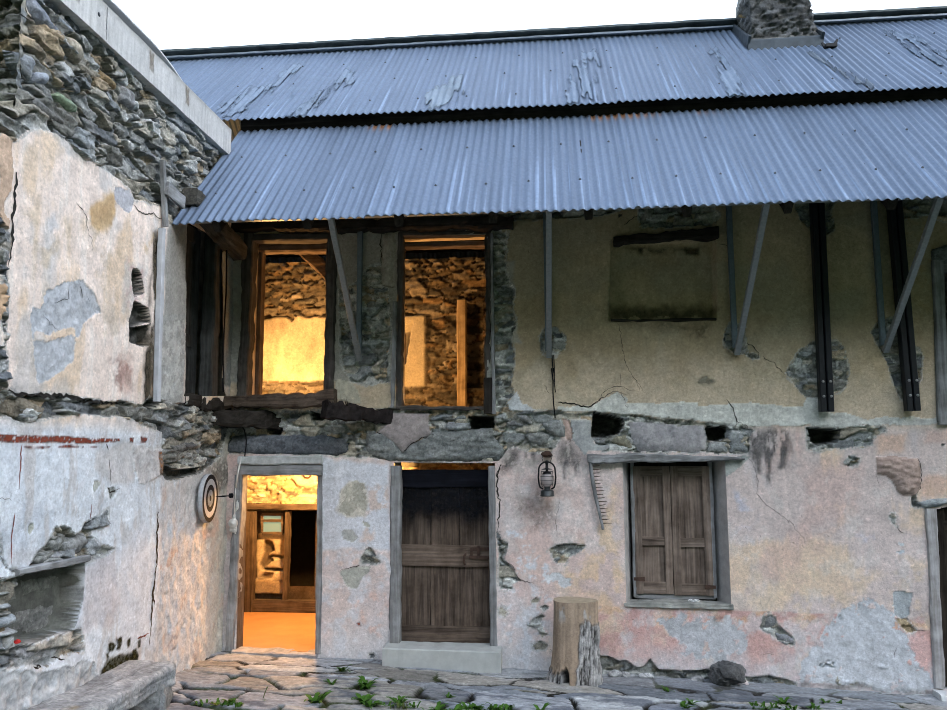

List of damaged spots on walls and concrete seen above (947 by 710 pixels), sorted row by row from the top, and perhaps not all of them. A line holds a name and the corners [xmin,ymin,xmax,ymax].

crack [8,172,18,265]
peeling [0,126,34,254]
peeling [8,277,103,396]
peeling [335,379,370,405]
peeling [374,407,433,452]
spalling [469,415,496,429]
crack [546,327,645,408]
peeling [506,339,938,477]
damp [753,439,786,481]
flaking render [871,316,903,401]
crack [149,512,159,644]
flaking render [497,530,521,591]